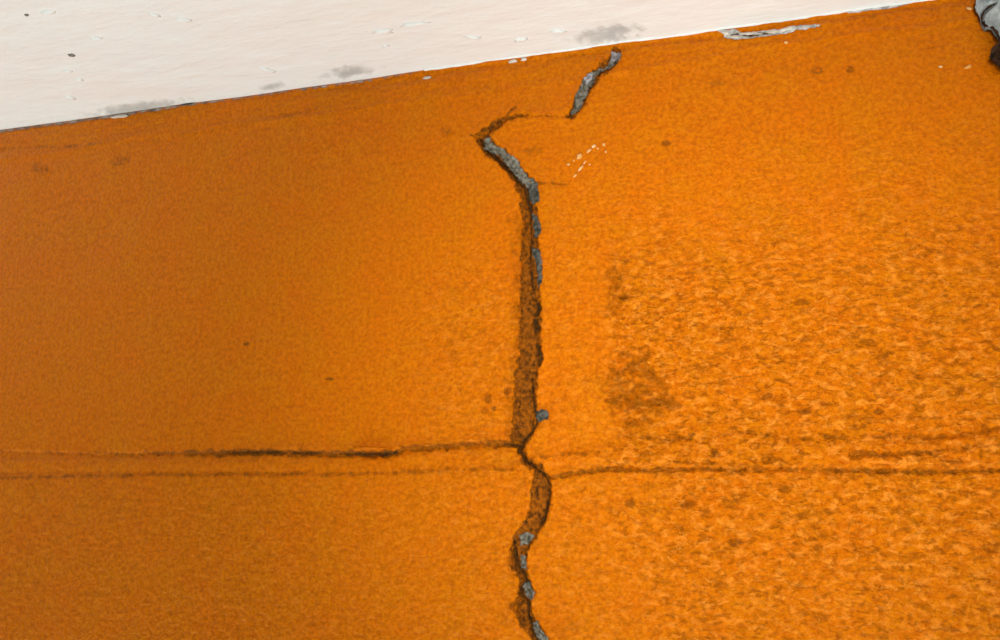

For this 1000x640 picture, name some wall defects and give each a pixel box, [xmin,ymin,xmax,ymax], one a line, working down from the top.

spalling [966,0,1000,67]
crack [140,47,1000,640]